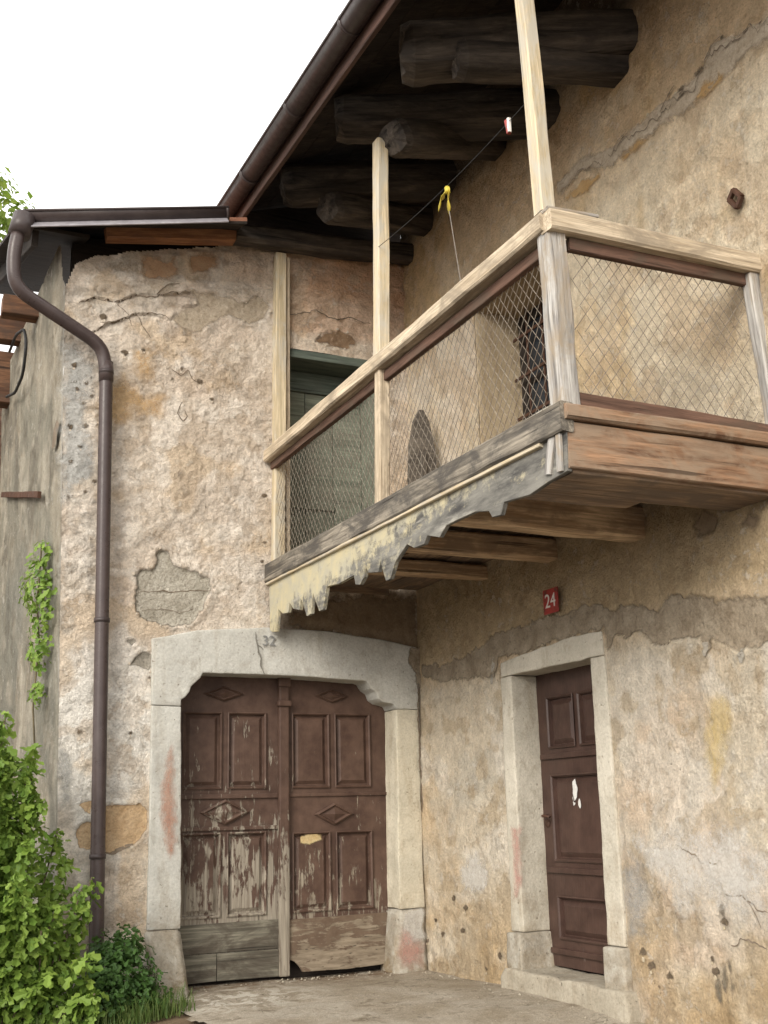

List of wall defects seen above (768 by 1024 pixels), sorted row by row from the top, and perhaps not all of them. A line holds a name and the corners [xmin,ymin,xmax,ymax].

crack [79,283,192,338]
spalling [132,547,215,627]
crack [255,632,264,673]
peeling [408,594,768,688]
peeling [76,801,91,849]
peeling [105,802,149,855]